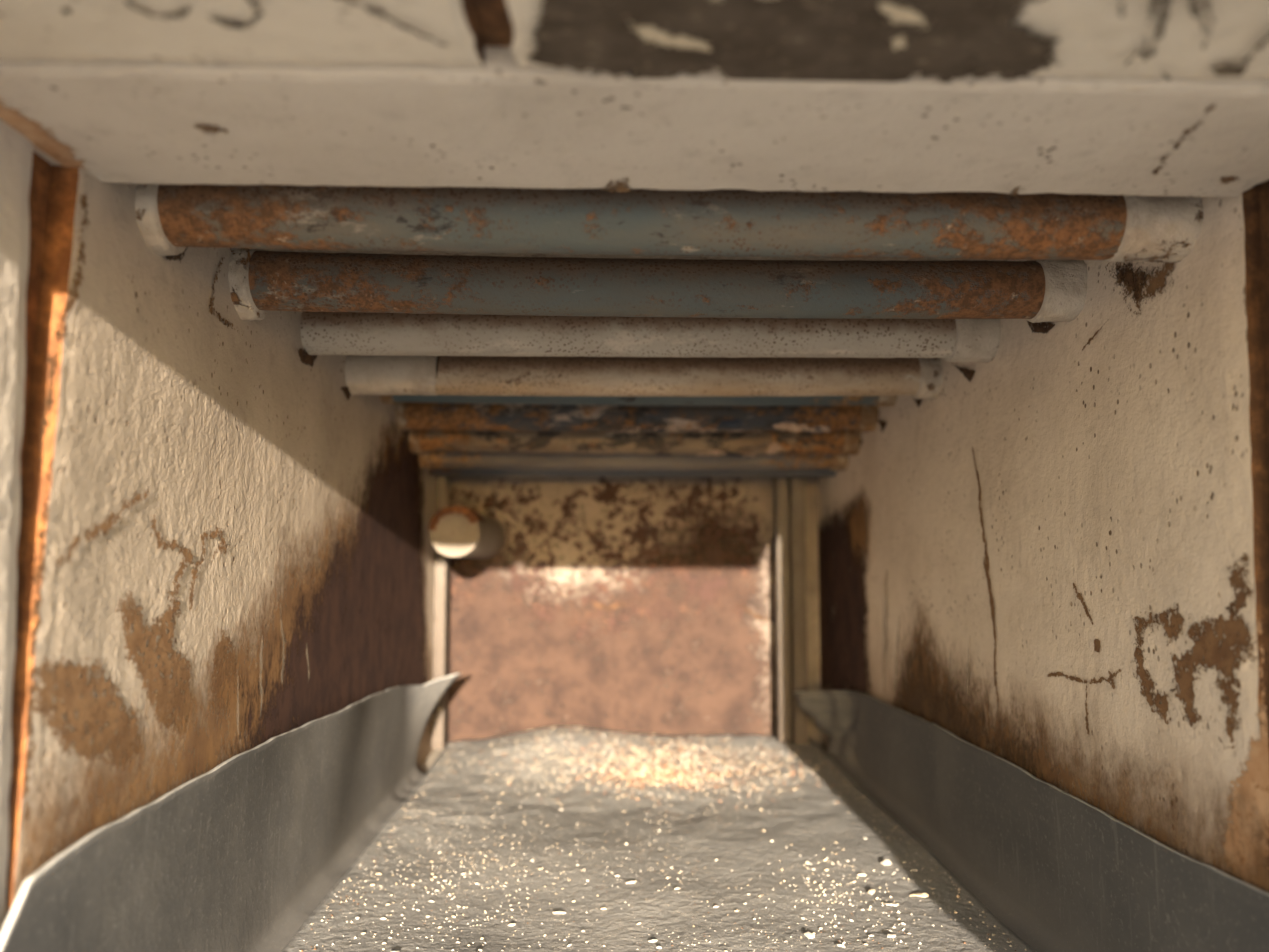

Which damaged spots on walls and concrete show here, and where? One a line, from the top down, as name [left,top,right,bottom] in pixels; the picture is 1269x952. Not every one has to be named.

crack [346,0,447,46]
spalling [524,0,1065,83]
spalling [1126,0,1172,65]
rust [0,100,90,847]
damp [20,424,429,880]
damp [447,506,777,742]
rust [957,367,975,382]
crack [972,446,999,704]
damp [895,615,1269,893]
crack [1048,583,1121,734]
spalling [1133,553,1261,749]
rust [1221,618,1269,889]